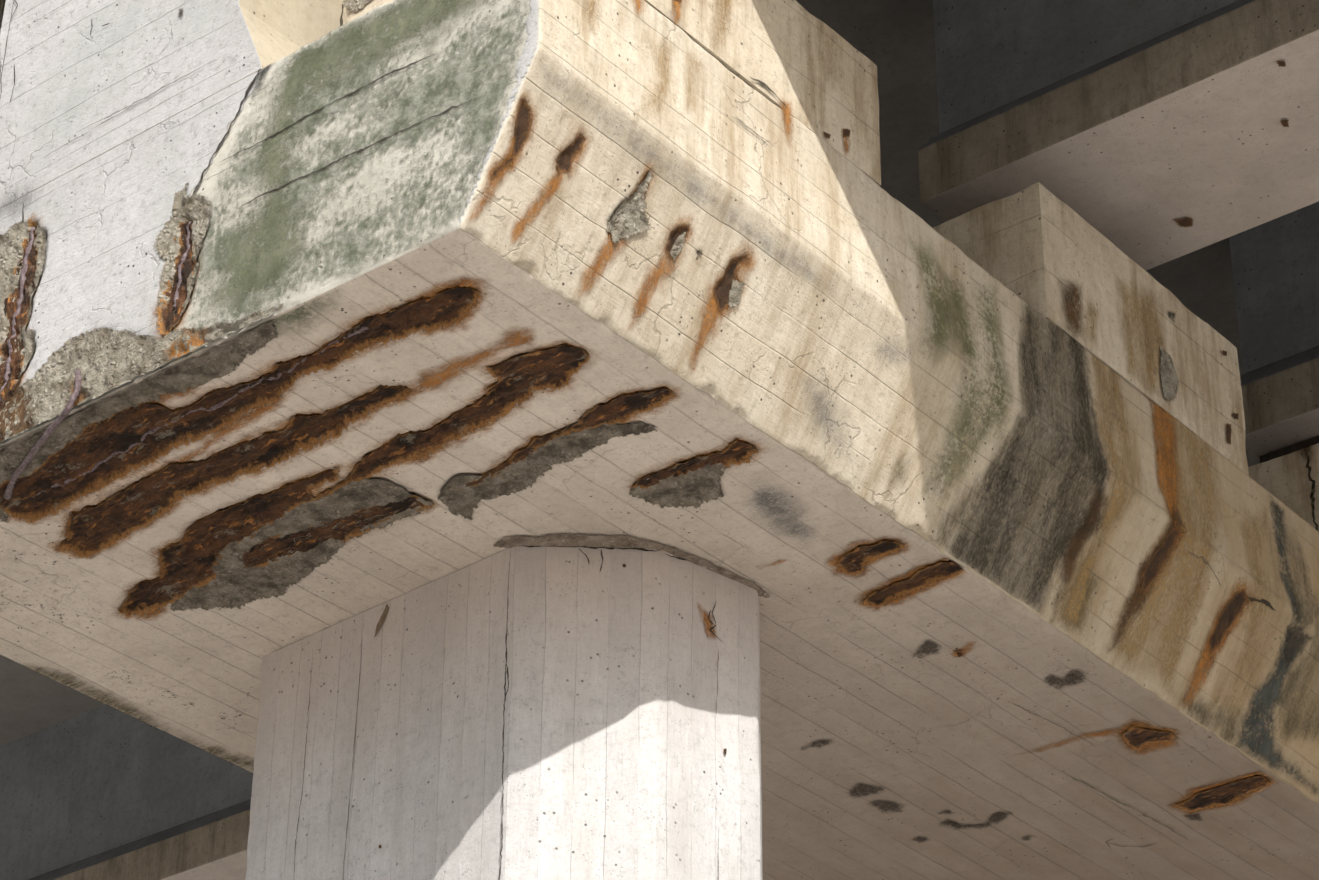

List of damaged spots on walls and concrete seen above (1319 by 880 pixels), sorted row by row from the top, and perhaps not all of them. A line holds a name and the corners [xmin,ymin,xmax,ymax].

rust [471,96,534,218]
rust [513,133,586,241]
spalling [0,63,678,619]
rust [634,223,692,317]
rust [693,252,754,370]
spalling [494,533,770,598]
spalling [629,439,759,509]
spalling [828,539,907,576]
leakage [952,284,1160,626]
leakage [1118,412,1215,682]
crack [1301,445,1319,531]
leakage [1189,502,1319,792]